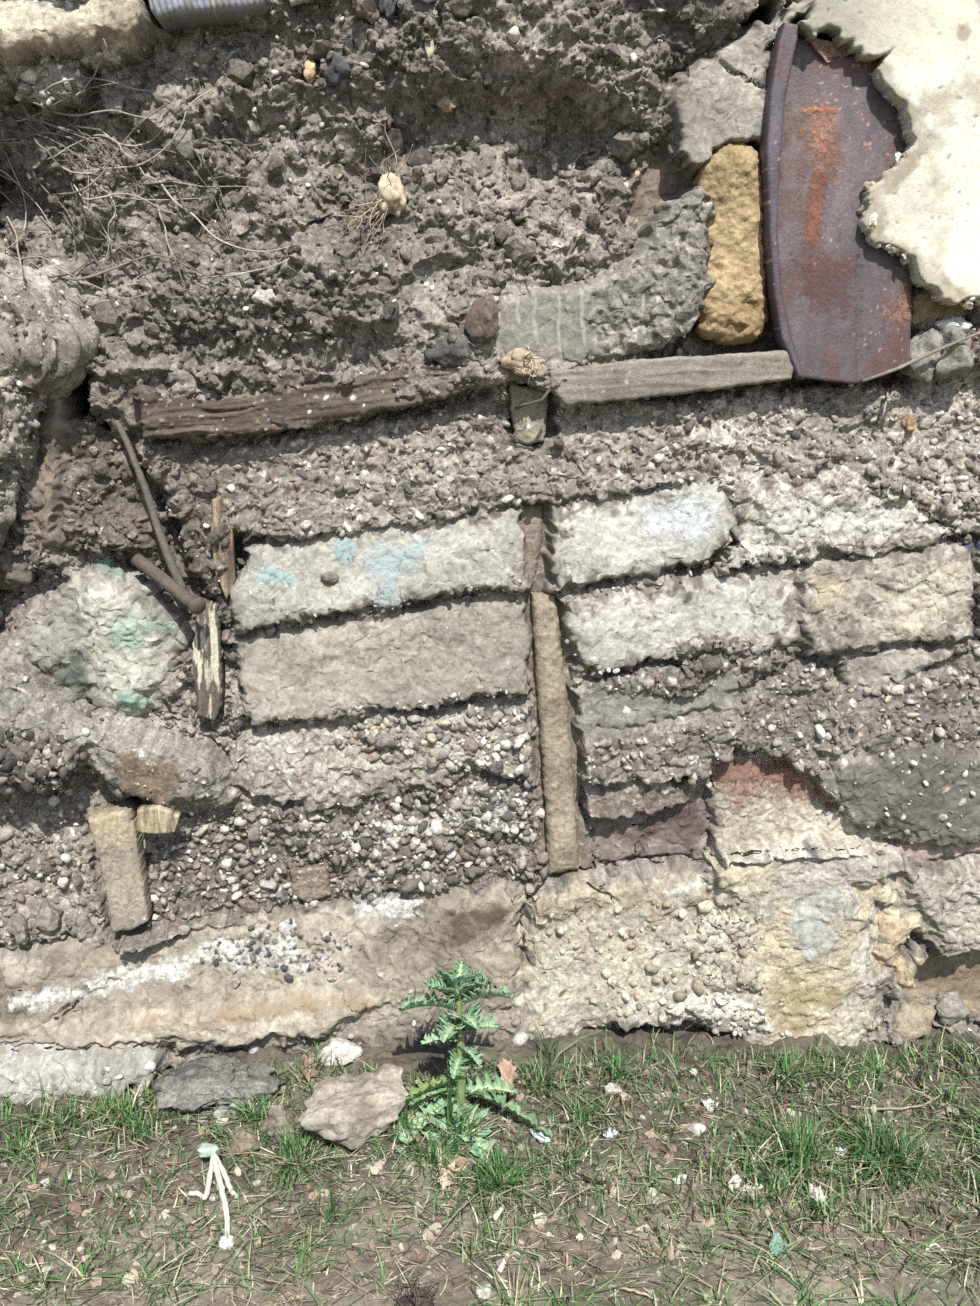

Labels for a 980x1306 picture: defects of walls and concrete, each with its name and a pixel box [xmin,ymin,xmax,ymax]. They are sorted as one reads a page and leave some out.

rust [759,22,913,384]